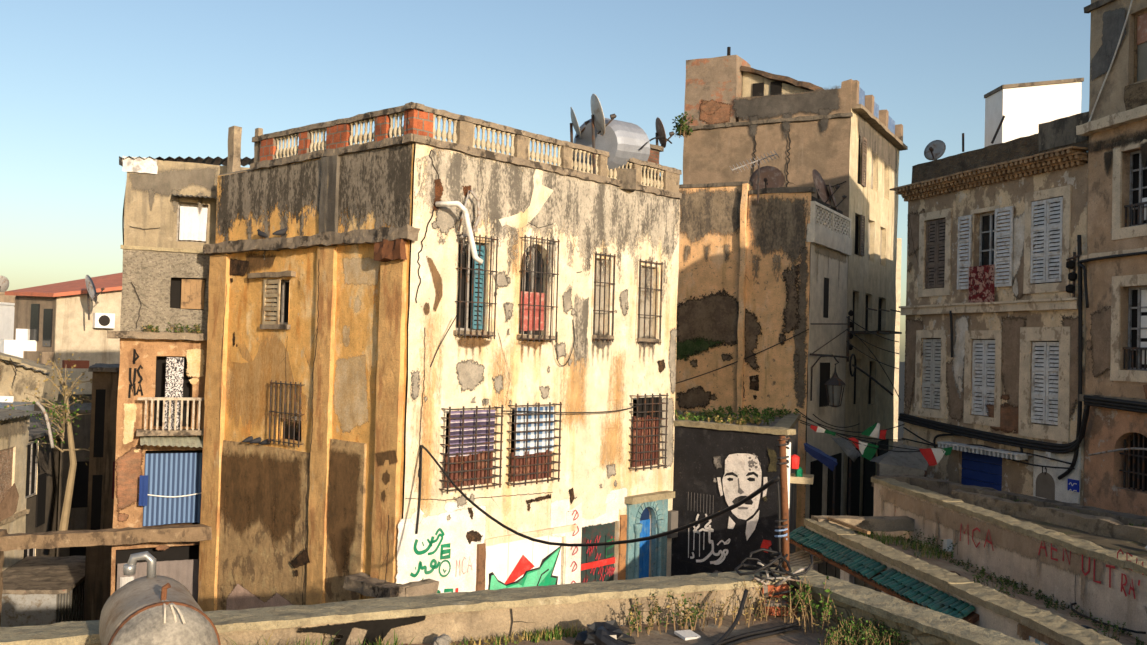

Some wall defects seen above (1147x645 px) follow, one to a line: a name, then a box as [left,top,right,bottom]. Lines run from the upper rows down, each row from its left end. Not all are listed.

damp [130,159,321,283]
damp [338,144,846,409]
peeling [779,265,802,345]
peeling [455,359,512,406]
peeling [535,386,550,407]
peeling [547,342,573,372]
peeling [657,288,762,468]
peeling [748,448,777,472]
damp [220,452,302,552]
damp [326,450,361,577]
peeling [226,584,293,610]